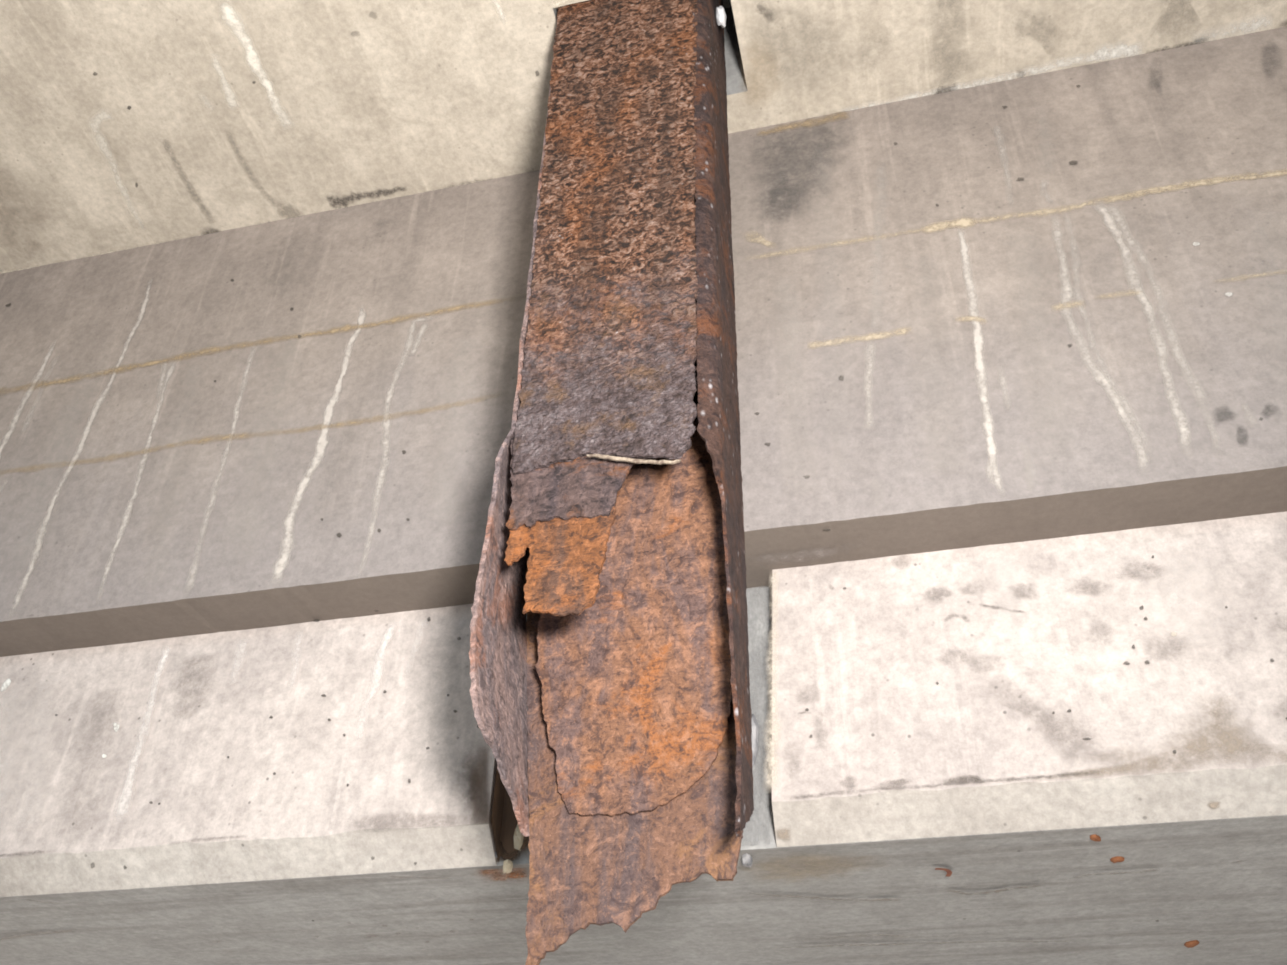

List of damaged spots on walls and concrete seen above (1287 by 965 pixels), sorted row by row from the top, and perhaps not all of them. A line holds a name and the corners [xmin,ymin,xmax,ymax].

water stain [0,346,53,457]
water stain [14,284,150,607]
water stain [102,362,174,583]
water stain [188,351,254,586]
water stain [274,309,365,579]
water stain [364,318,426,559]
rust [504,484,623,616]
peeling [506,419,732,817]
water stain [958,232,1006,489]
water stain [1054,221,1147,466]
water stain [1097,205,1203,446]
rust [472,730,530,880]